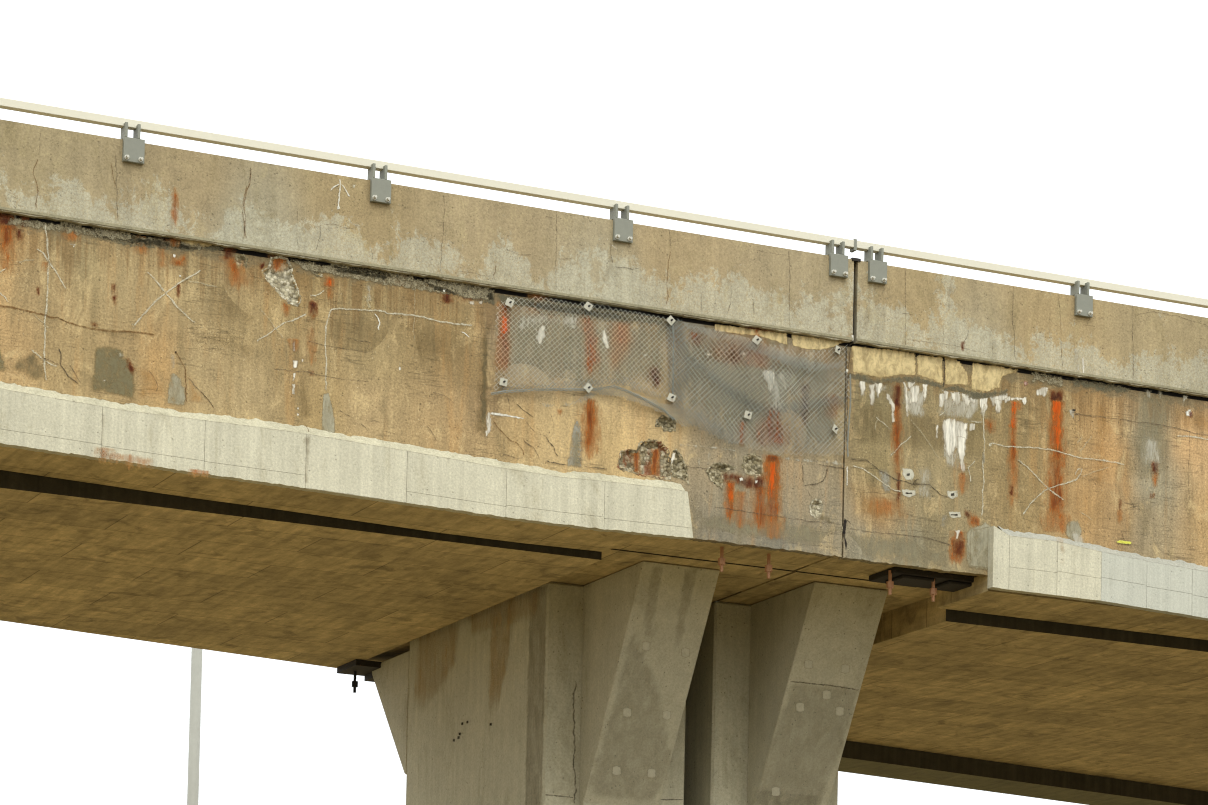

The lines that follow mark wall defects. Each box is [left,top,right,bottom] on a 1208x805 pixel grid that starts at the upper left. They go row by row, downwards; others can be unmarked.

corrosion [0,214,27,269]
spalling [8,218,203,252]
spalling [235,254,663,325]
crack [0,305,213,406]
corrosion [584,399,597,457]
spalling [617,415,689,485]
spalling [706,453,764,490]
corrosion [723,407,789,536]
damp [860,381,1048,471]
corrosion [1009,401,1020,501]
corrosion [1046,391,1066,533]
corrosion [949,512,979,562]